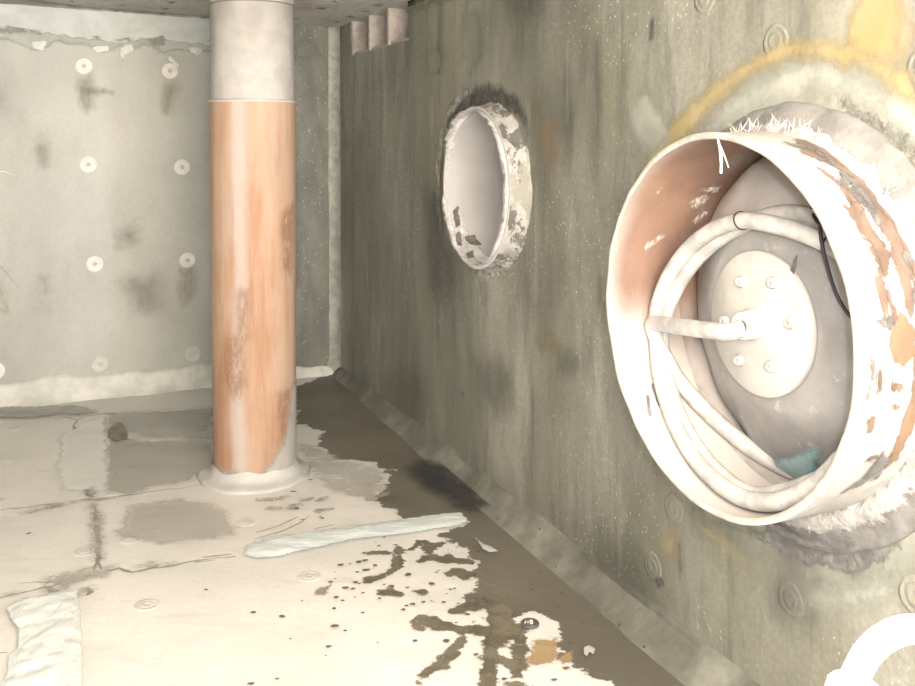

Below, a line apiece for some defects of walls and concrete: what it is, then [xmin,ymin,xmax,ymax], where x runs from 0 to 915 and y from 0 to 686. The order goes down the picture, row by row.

peeling [0,1,211,67]
rust [648,0,915,162]
peeling [453,207,481,258]
damp [410,460,486,508]
crack [1,484,235,595]
spalling [749,529,898,575]
crack [0,581,60,598]